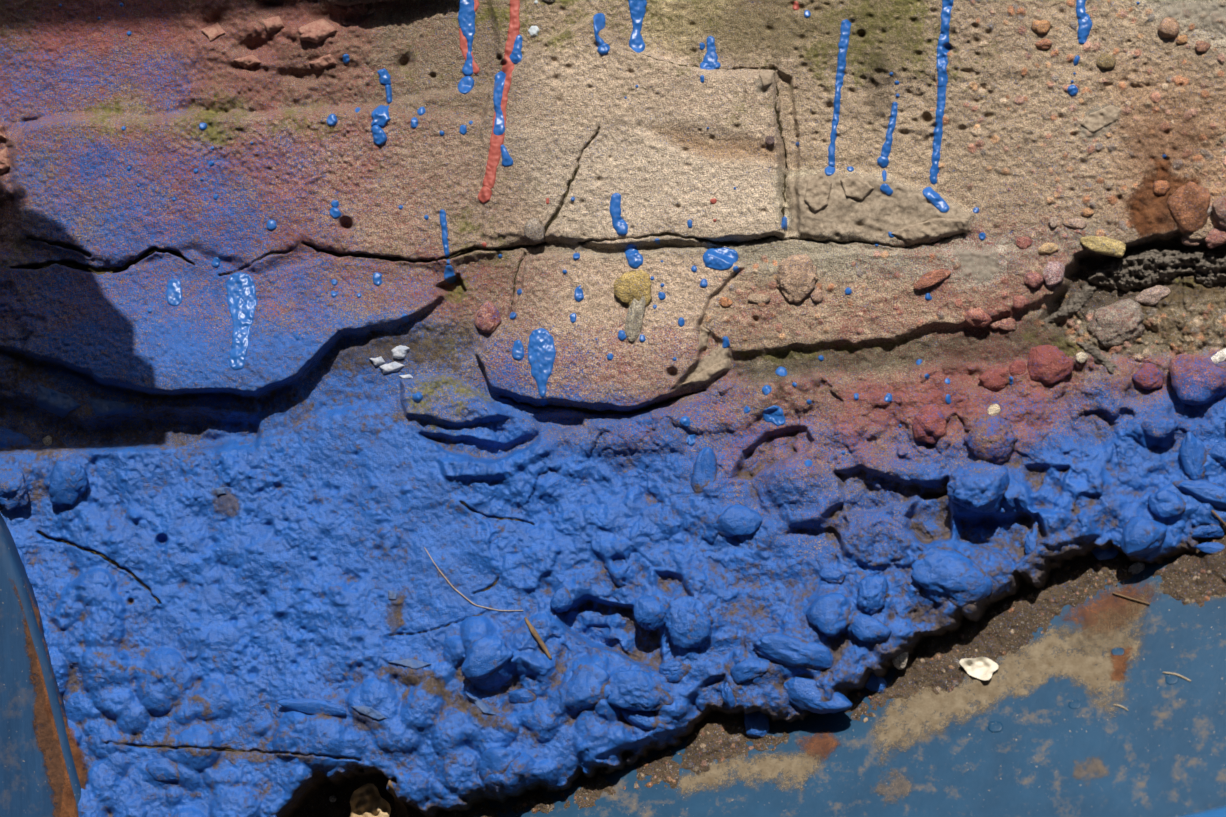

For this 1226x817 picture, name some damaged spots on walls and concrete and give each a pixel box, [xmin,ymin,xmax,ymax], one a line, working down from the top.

crack [222,51,951,318]
crack [12,238,193,275]
crack [39,532,159,603]
corrosion [13,581,88,817]
crack [114,738,355,760]